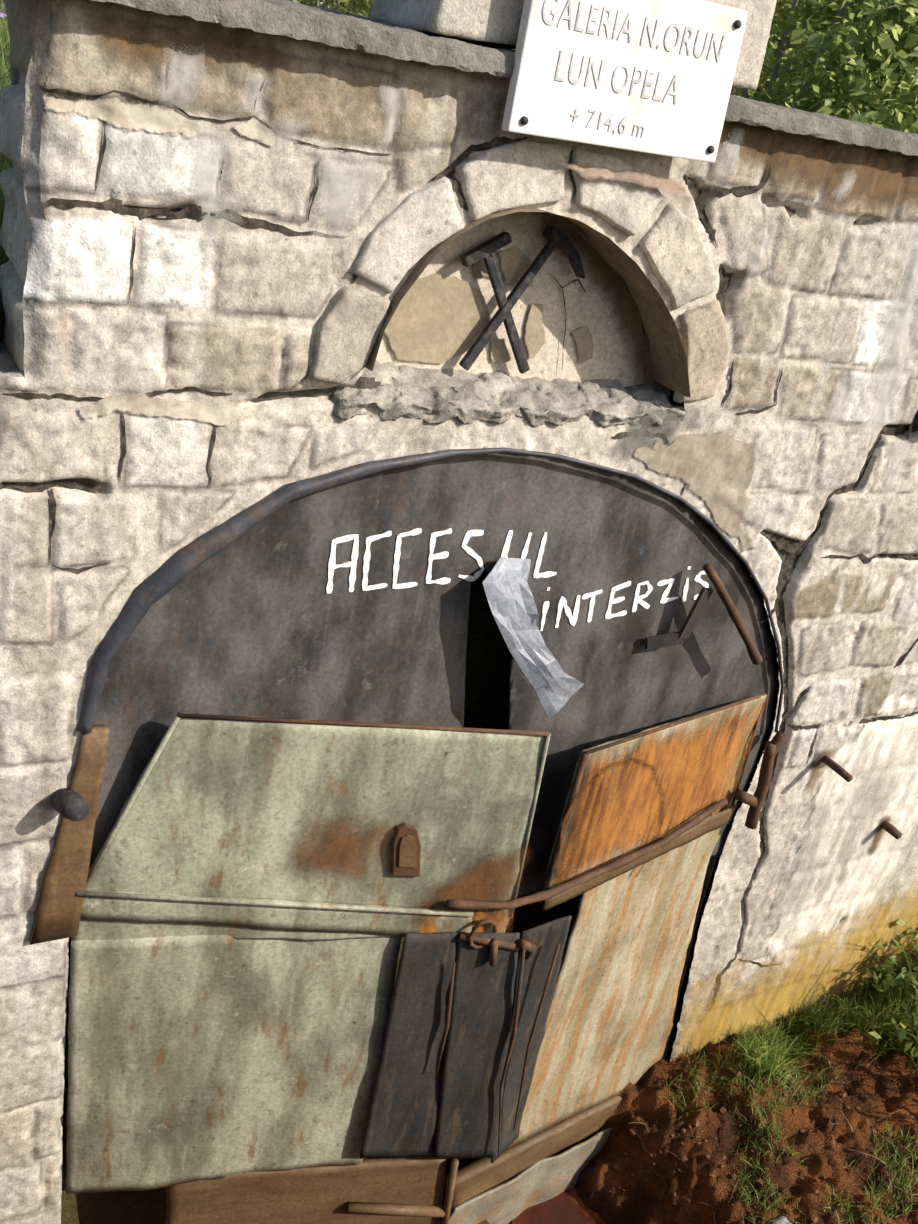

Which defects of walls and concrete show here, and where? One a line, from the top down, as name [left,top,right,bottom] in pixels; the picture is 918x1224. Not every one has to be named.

crack [38,49,392,304]
crack [434,136,527,211]
crack [568,150,576,201]
crack [686,152,772,316]
crack [722,360,783,414]
crack [612,432,670,446]
crack [713,424,918,1002]
corrosion [558,711,756,884]
corrosion [299,821,381,870]
corrosion [871,817,891,854]
corrosion [419,858,517,933]
corrosion [675,887,918,1058]